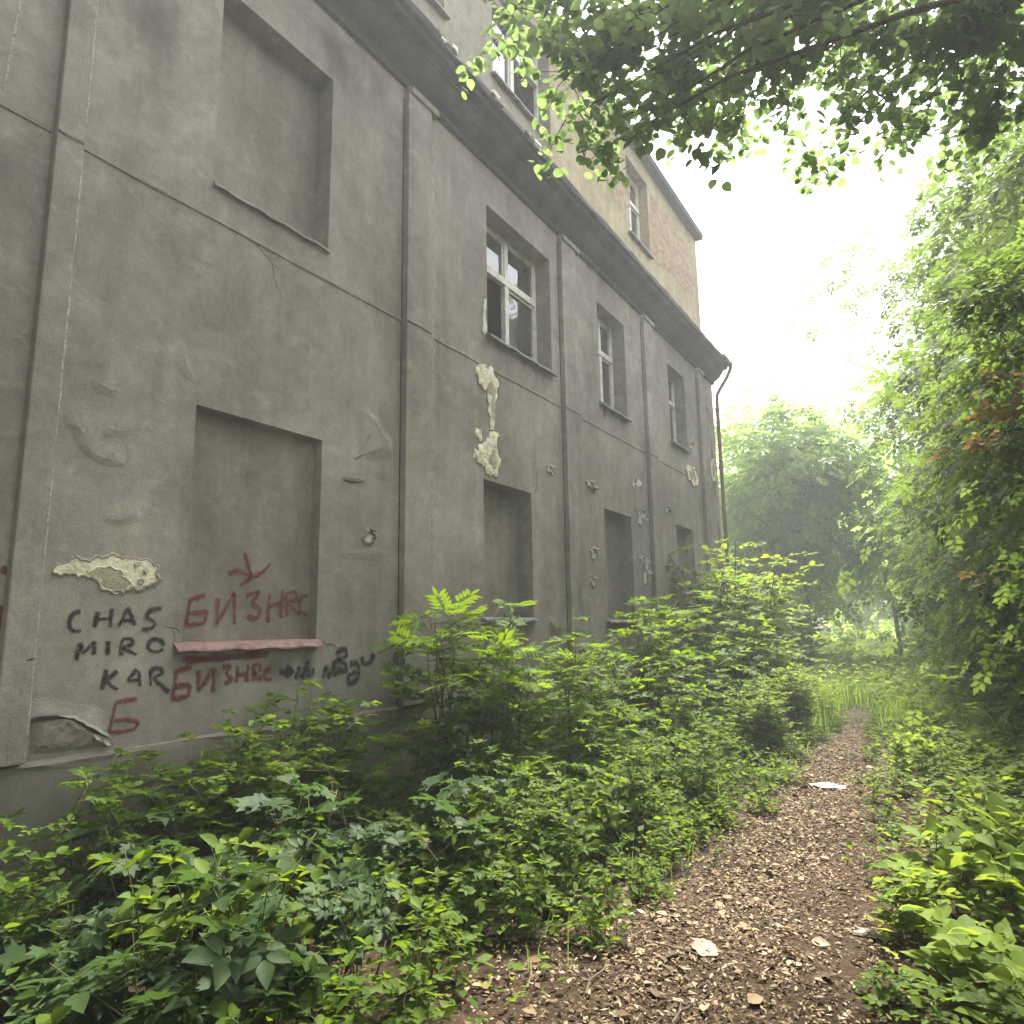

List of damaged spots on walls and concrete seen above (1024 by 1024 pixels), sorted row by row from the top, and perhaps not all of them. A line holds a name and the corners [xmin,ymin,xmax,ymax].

peeling [43,456,163,596]
peeling [360,527,379,547]
peeling [473,363,501,479]
peeling [685,458,718,488]